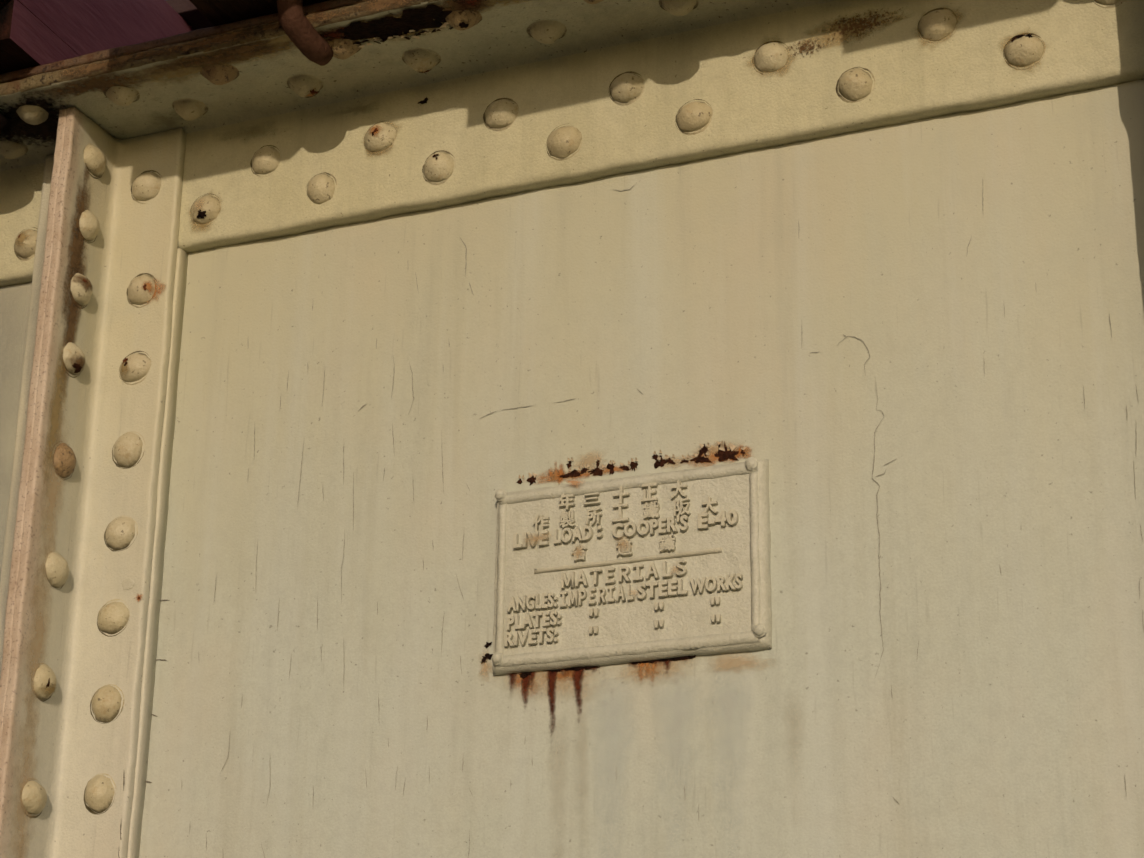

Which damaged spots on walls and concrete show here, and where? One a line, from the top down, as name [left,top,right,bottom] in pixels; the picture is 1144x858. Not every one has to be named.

corrosion [778,6,903,72]
corrosion [540,465,589,486]
corrosion [698,447,749,464]
crack [801,326,896,696]
corrosion [509,666,599,732]